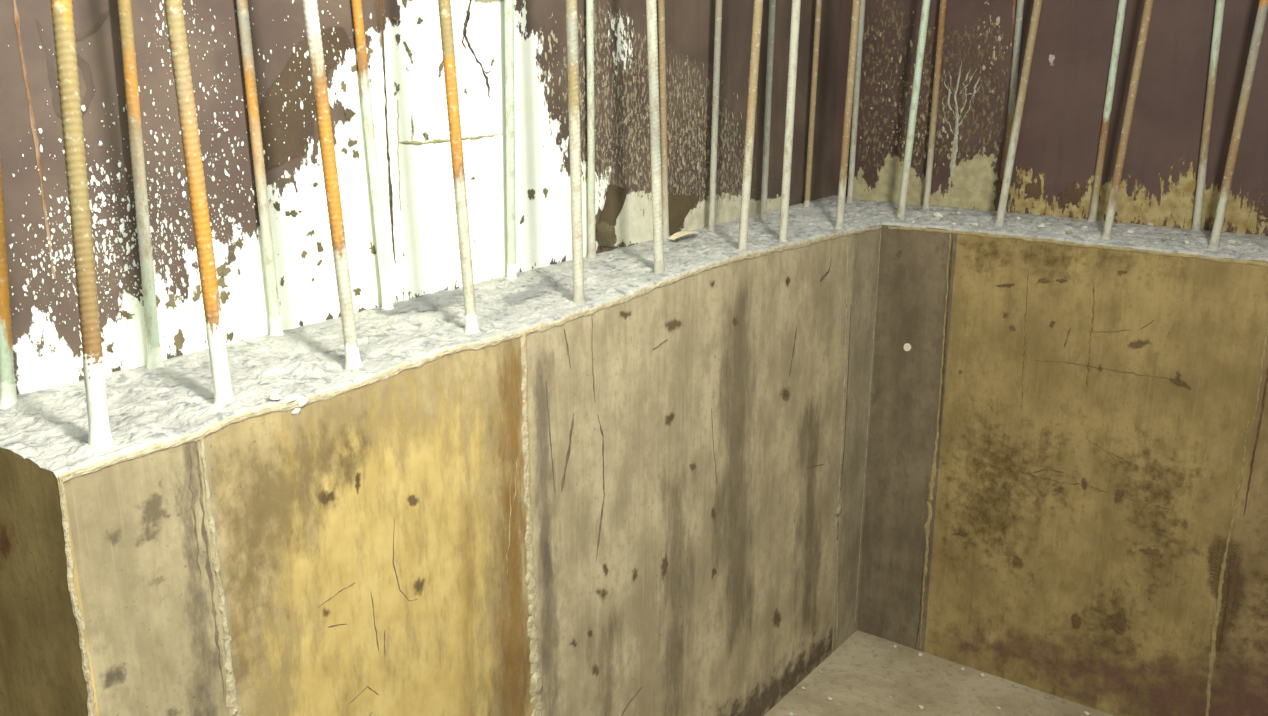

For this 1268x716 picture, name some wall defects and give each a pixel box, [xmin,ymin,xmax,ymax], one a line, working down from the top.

rust [13,0,56,279]
peeling [0,0,822,449]
crack [381,0,499,264]
peeling [834,0,1268,249]
water stain [730,632,833,716]
water stain [1071,659,1268,716]
water stain [1210,541,1243,648]